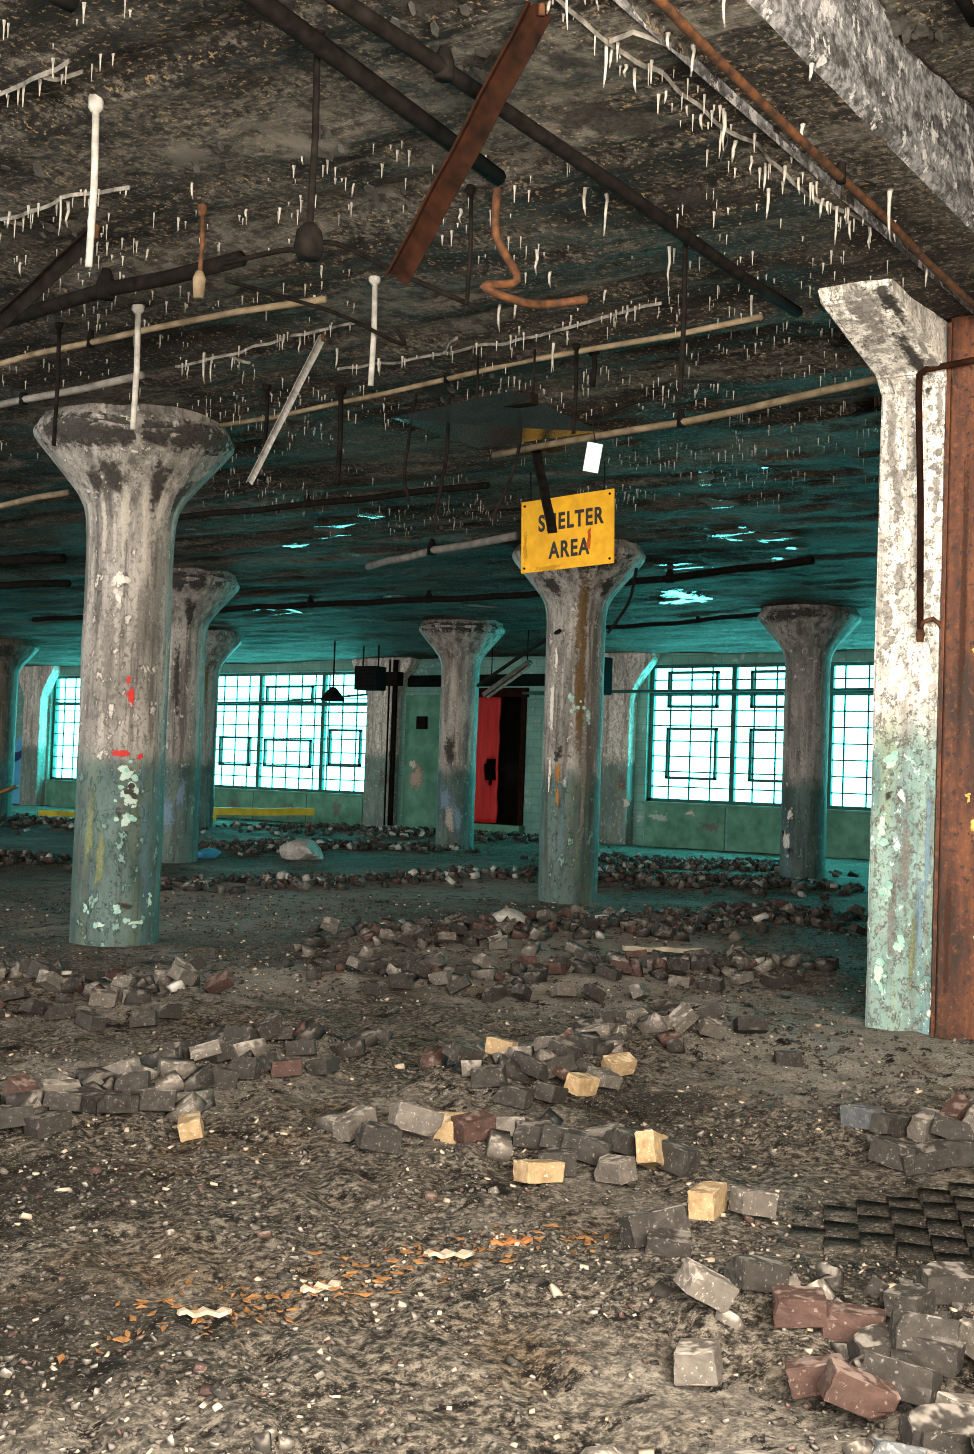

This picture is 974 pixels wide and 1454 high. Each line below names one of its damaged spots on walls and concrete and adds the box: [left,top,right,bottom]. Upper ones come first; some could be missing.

water stain [545,54,599,69]
water stain [542,97,665,138]
water stain [650,186,731,210]
peeling [882,384,943,714]
corrosion [957,461,970,735]
peeling [883,751,899,769]
peeling [114,760,140,827]
peeling [782,807,793,858]
peeling [876,789,905,847]
peeling [83,893,152,929]
peeling [878,880,893,904]
peeling [873,935,906,992]